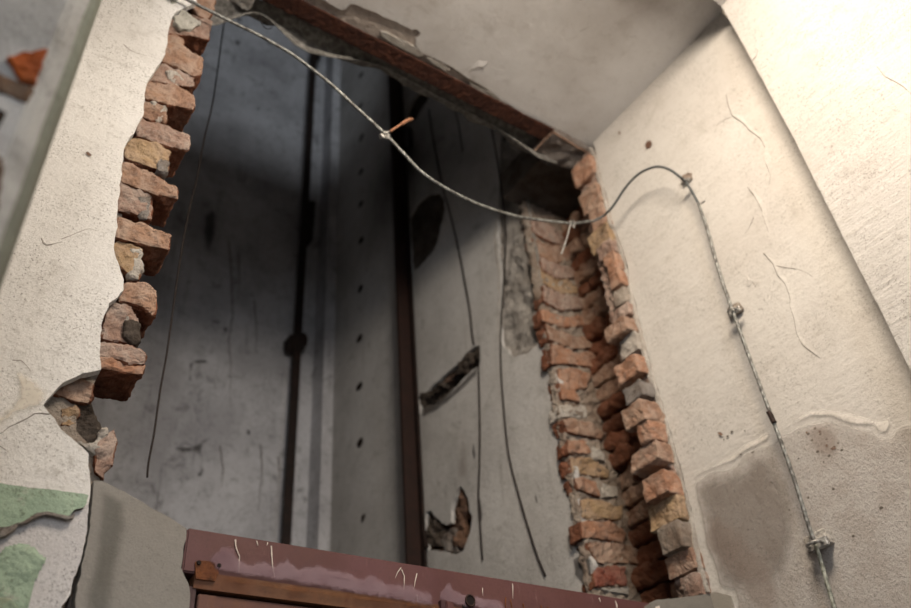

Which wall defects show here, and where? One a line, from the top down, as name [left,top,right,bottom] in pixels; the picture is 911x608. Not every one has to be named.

spalling [499,191,543,357]
crack [723,95,820,358]
peeling [0,483,89,608]
spalling [426,489,483,554]
peeling [574,557,591,581]
water stain [696,411,911,608]